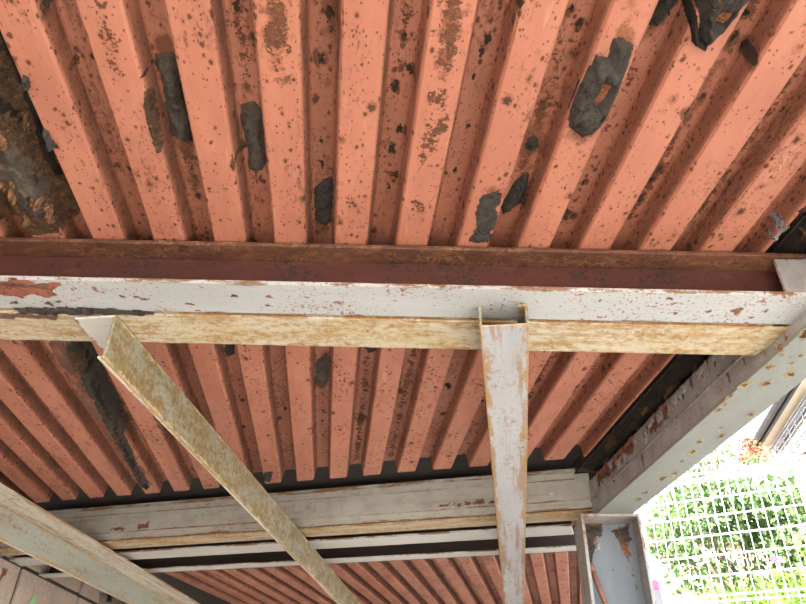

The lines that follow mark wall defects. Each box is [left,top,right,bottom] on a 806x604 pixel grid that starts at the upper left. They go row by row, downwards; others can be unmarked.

corrosion [229,0,267,185]
corrosion [261,0,293,88]
corrosion [413,0,467,181]
corrosion [385,119,407,189]
corrosion [769,206,806,254]
peeling [0,277,62,320]
peeling [49,341,115,442]
peeling [596,355,726,486]
corrosion [582,354,773,483]
corrosion [585,523,632,563]